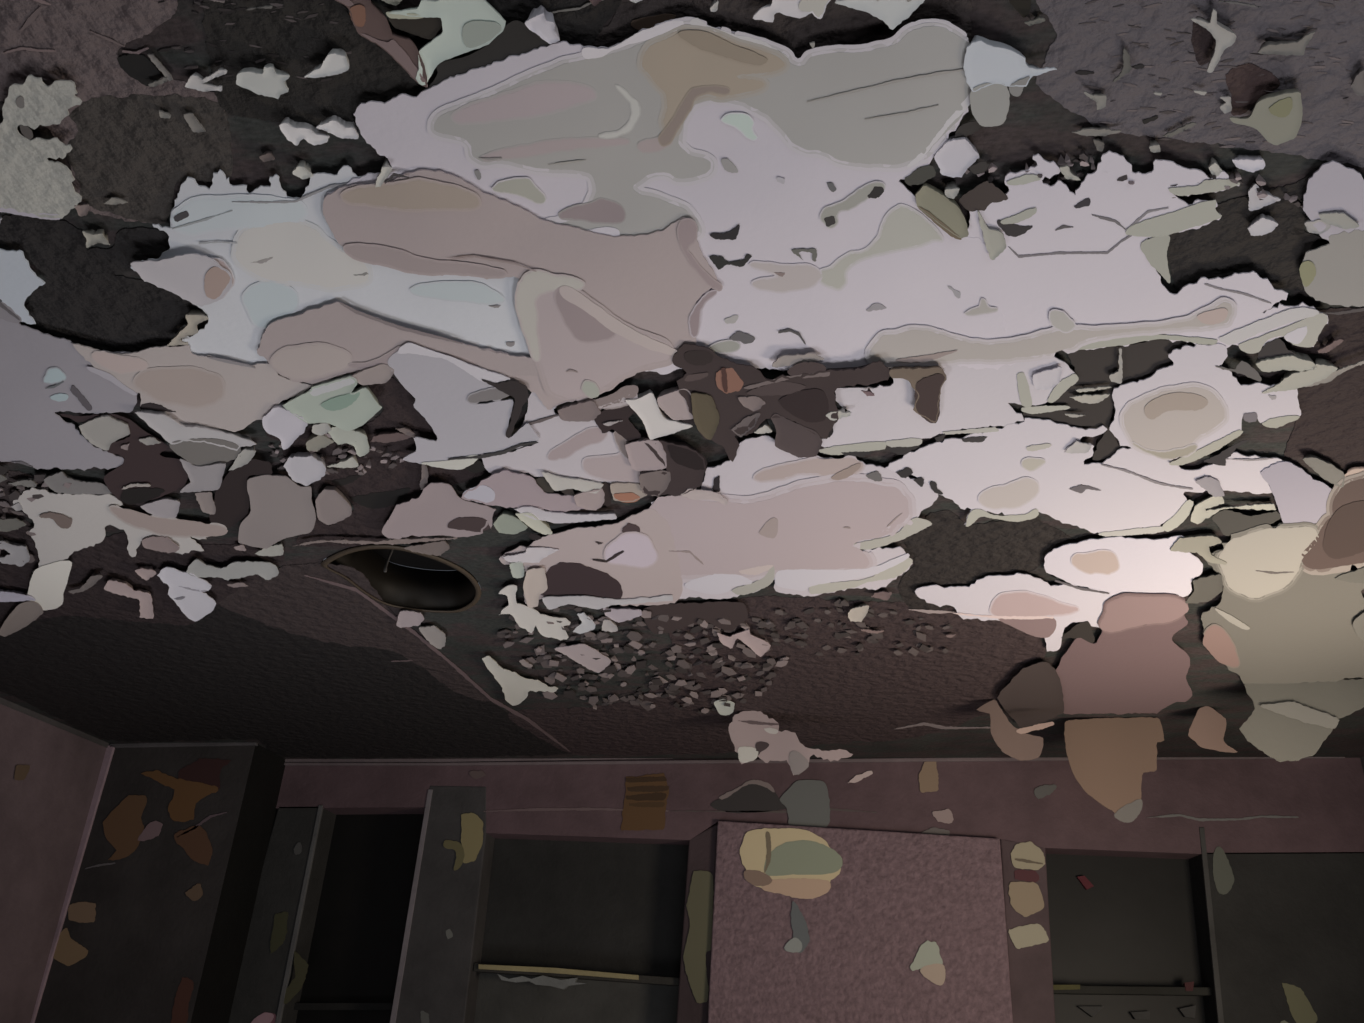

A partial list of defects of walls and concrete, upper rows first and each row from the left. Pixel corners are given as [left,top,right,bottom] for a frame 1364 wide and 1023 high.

spalling [0,0,1364,352]
spalling [1022,339,1195,461]
spalling [1216,307,1364,487]
spalling [1171,440,1281,604]
spalling [0,343,1164,953]
peeling [1188,706,1237,753]
peeling [1260,702,1339,729]